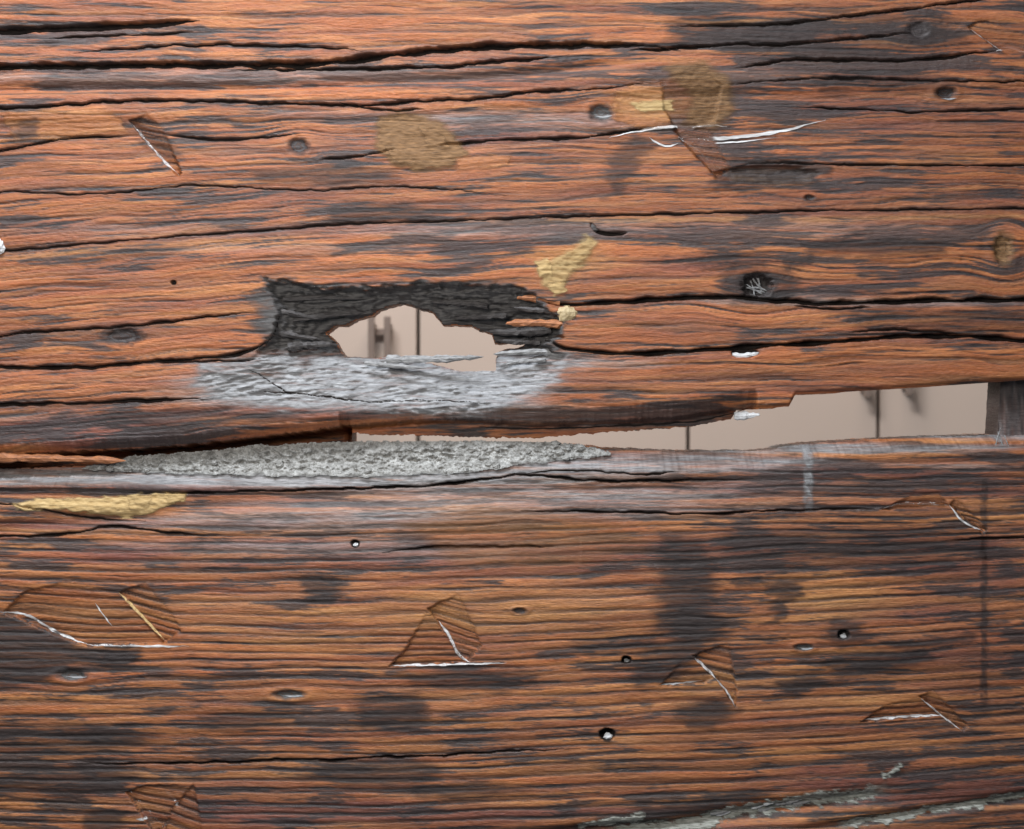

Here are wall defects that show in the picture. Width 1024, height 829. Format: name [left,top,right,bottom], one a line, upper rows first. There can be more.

crack [0,0,1024,114]
spalling [252,277,567,356]
crack [537,296,1024,356]
spalling [3,581,180,648]
spalling [393,595,503,666]
spalling [662,645,736,706]
spalling [861,691,966,729]